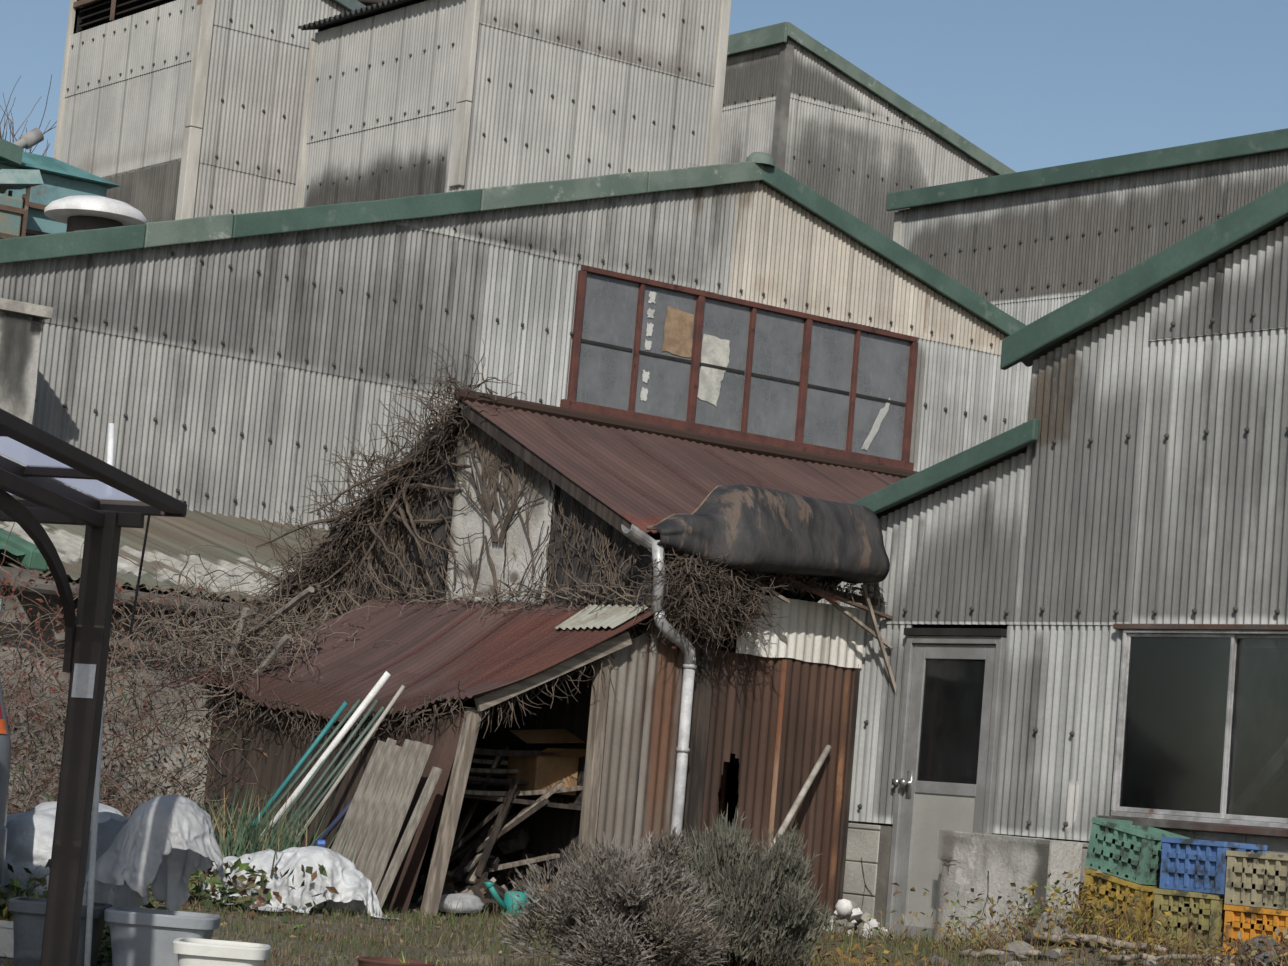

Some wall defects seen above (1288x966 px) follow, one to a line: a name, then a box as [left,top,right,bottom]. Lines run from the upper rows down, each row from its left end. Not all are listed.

leakage [723,55,862,110]
leakage [305,158,446,207]
leakage [793,133,919,240]
rust [836,754,844,809]